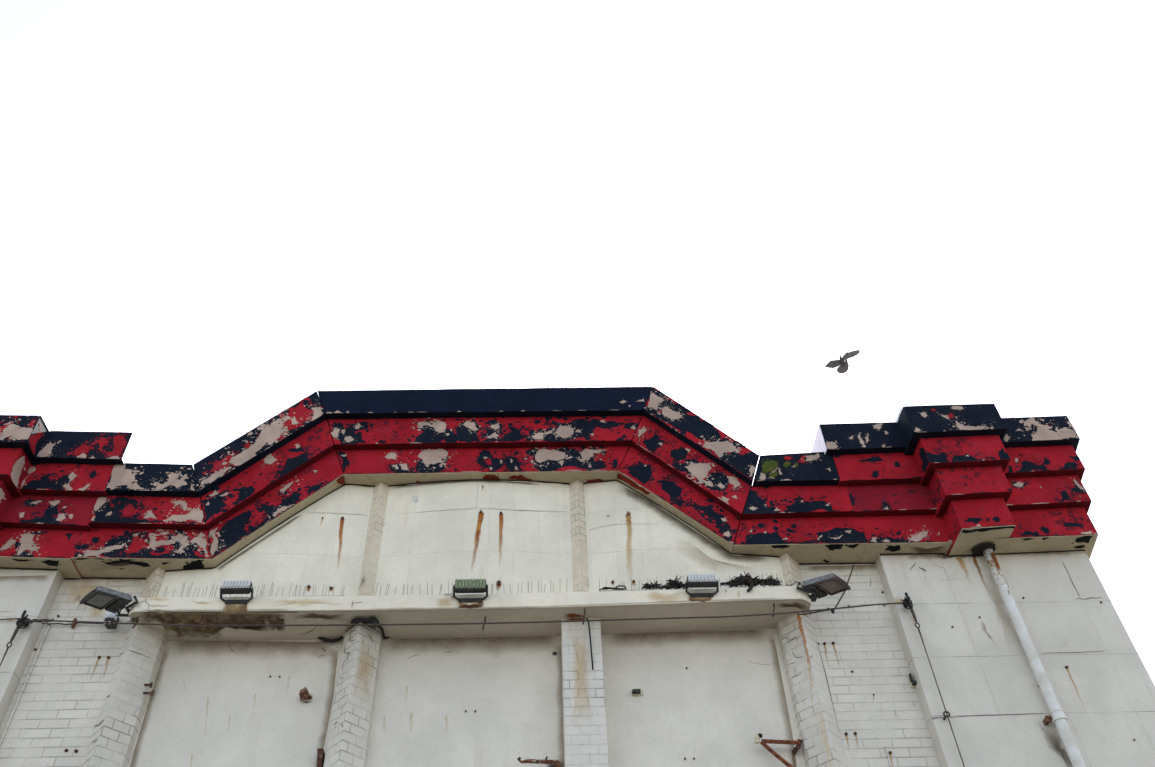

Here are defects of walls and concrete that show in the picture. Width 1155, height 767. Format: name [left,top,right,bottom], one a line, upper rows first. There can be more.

peeling [914,406,1087,502]
peeling [0,387,940,569]
rust [475,510,483,548]
peeling [961,516,1093,549]
damp [144,612,337,634]